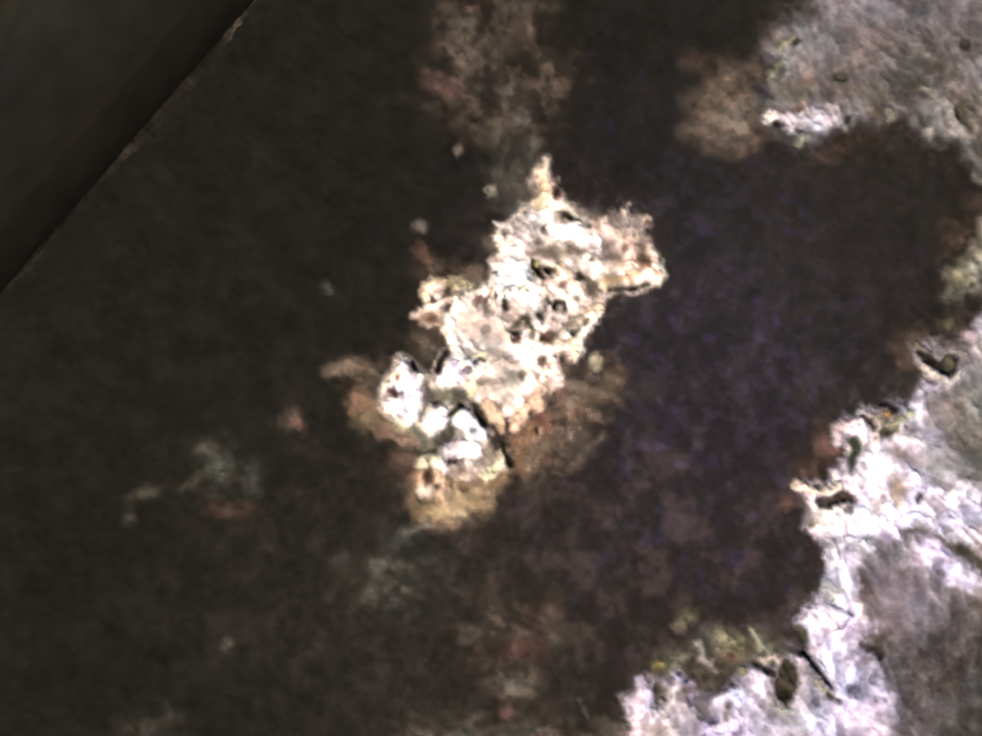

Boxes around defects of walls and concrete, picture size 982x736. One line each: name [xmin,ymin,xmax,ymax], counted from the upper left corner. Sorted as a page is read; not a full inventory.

leakage [412,219,427,234]